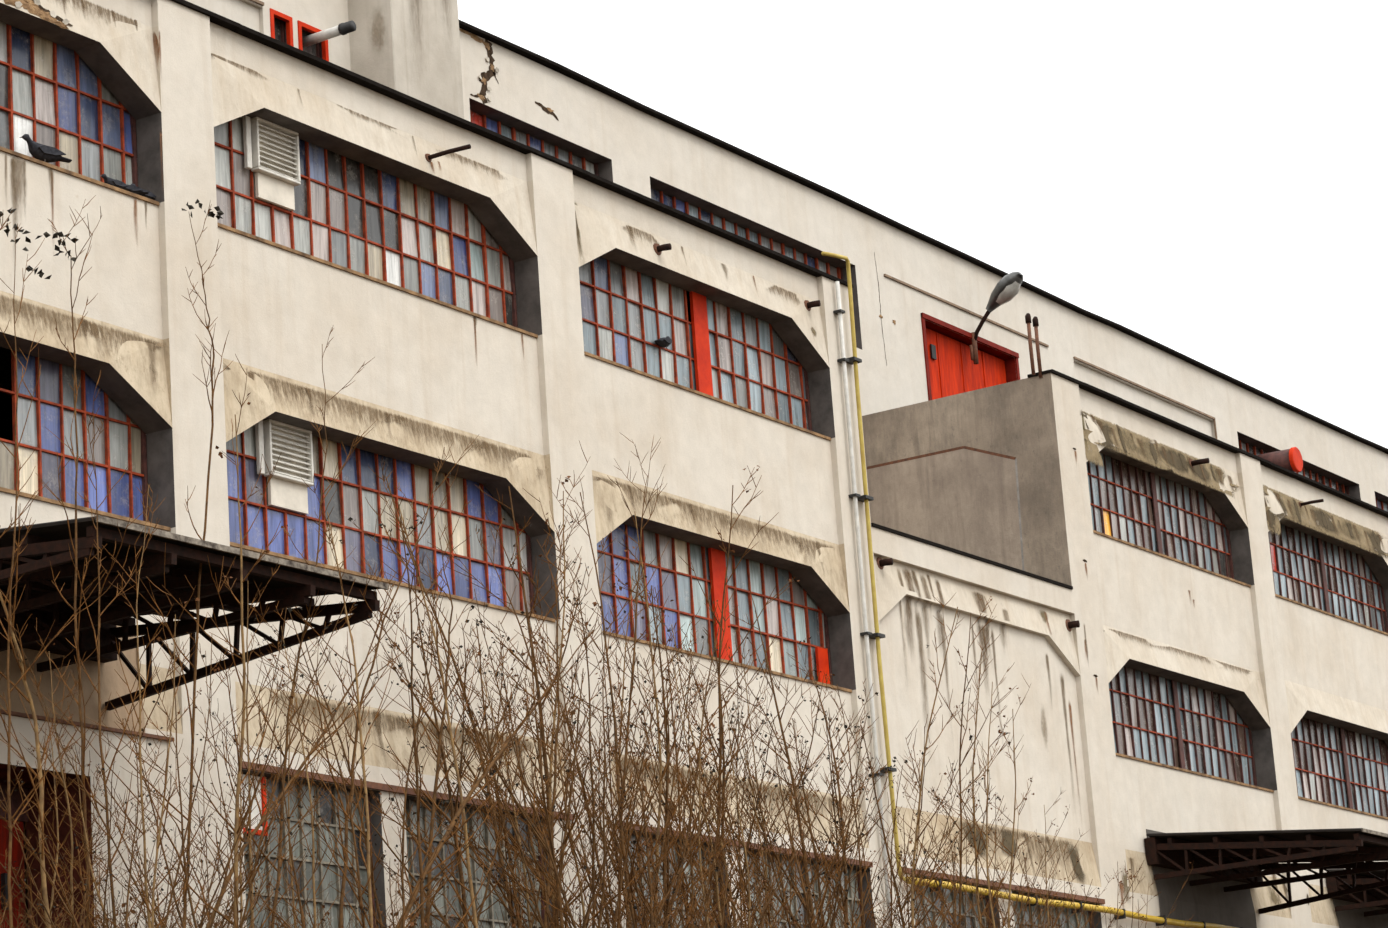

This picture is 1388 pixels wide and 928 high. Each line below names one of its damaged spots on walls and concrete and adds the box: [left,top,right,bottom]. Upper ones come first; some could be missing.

spalling [4,0,73,29]
crack [459,28,499,104]
leakage [5,157,26,214]
leakage [899,570,948,692]
leakage [972,593,1008,682]
leakage [1061,678,1076,764]